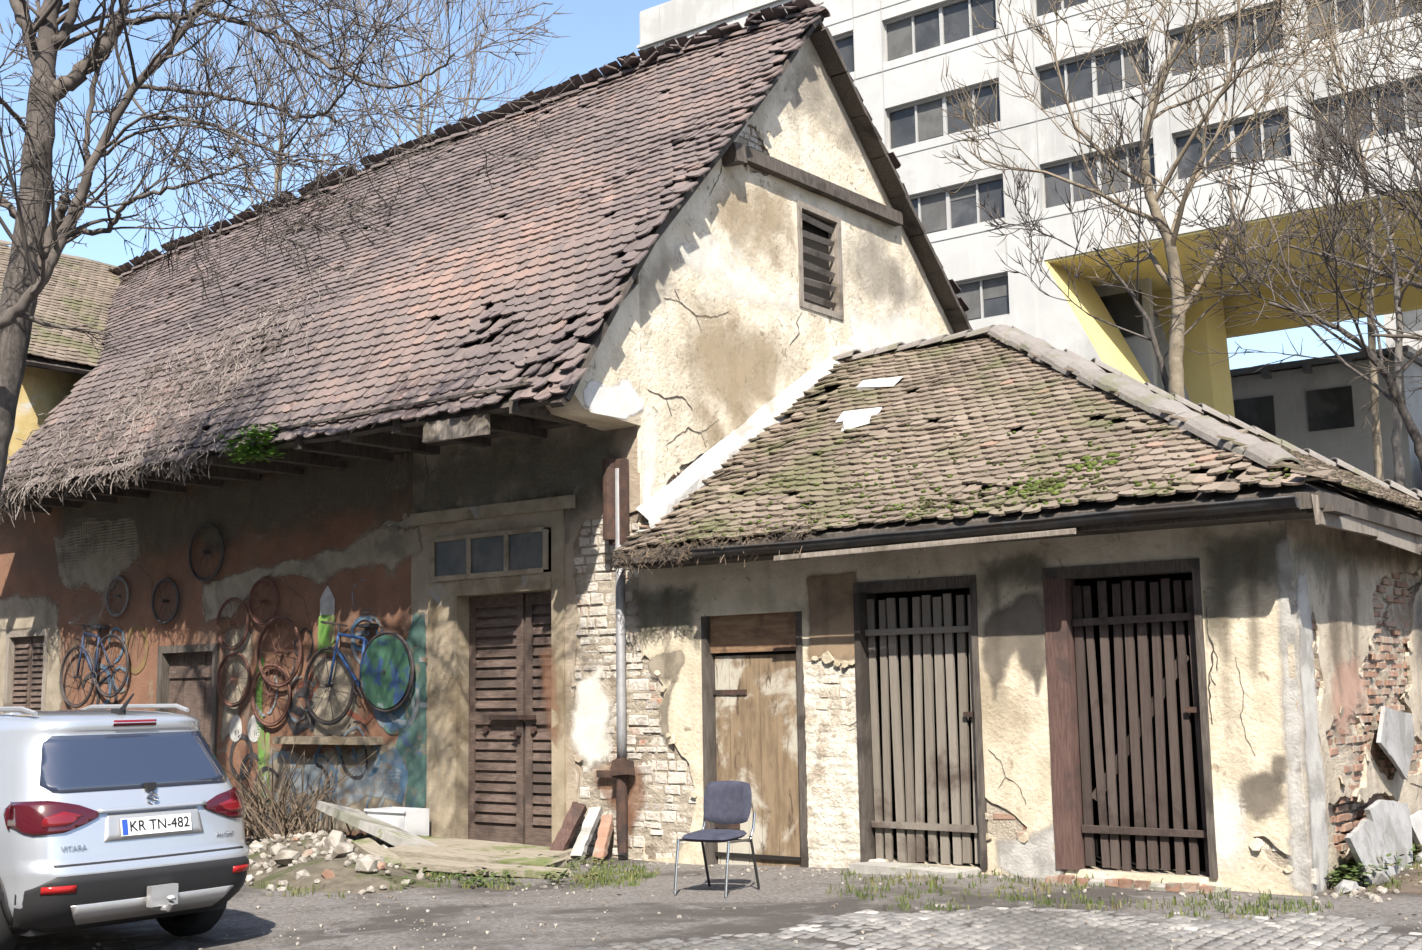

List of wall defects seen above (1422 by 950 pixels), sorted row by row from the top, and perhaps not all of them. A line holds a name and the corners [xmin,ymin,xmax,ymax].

crack [664,289,729,330]
crack [648,389,719,447]
peeling [0,594,63,713]
peeling [202,525,422,741]
flaking render [570,517,698,860]
flaking render [803,651,888,868]
crack [989,750,1026,803]
leakage [983,557,1047,694]
leakage [1204,536,1282,629]
leakage [1213,756,1287,866]
leakage [1299,534,1422,728]
flaking render [1326,568,1422,857]